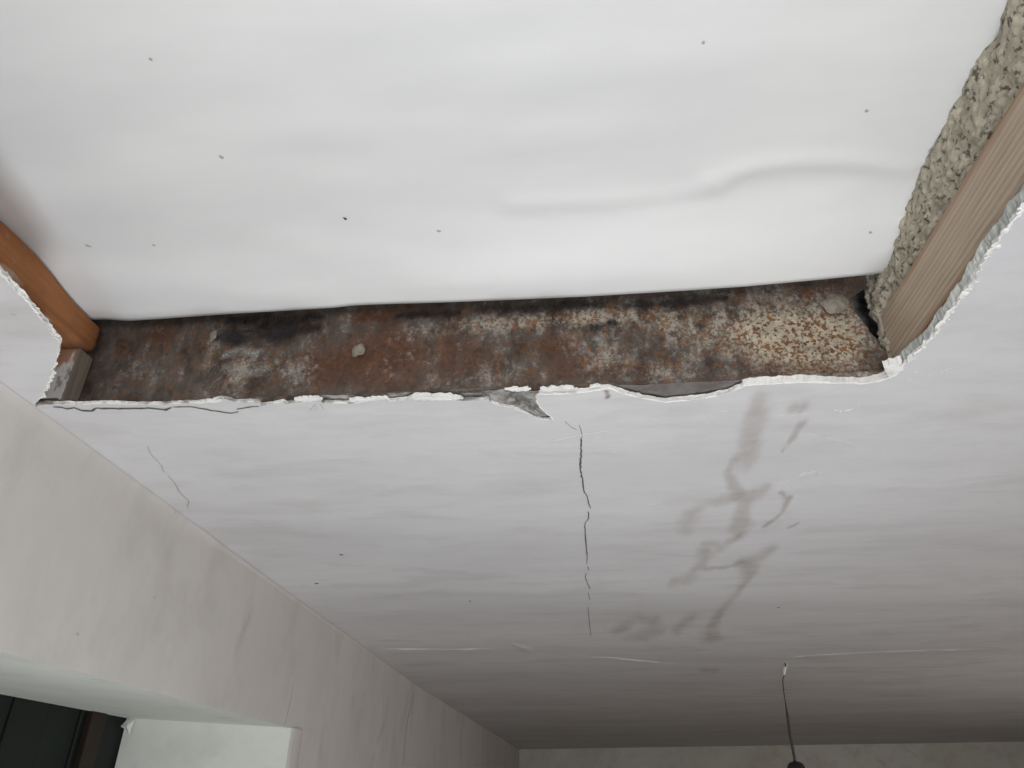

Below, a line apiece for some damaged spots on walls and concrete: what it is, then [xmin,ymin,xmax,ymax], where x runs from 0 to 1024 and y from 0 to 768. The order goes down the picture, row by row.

spalling [0,185,1024,420]
crack [569,425,591,633]